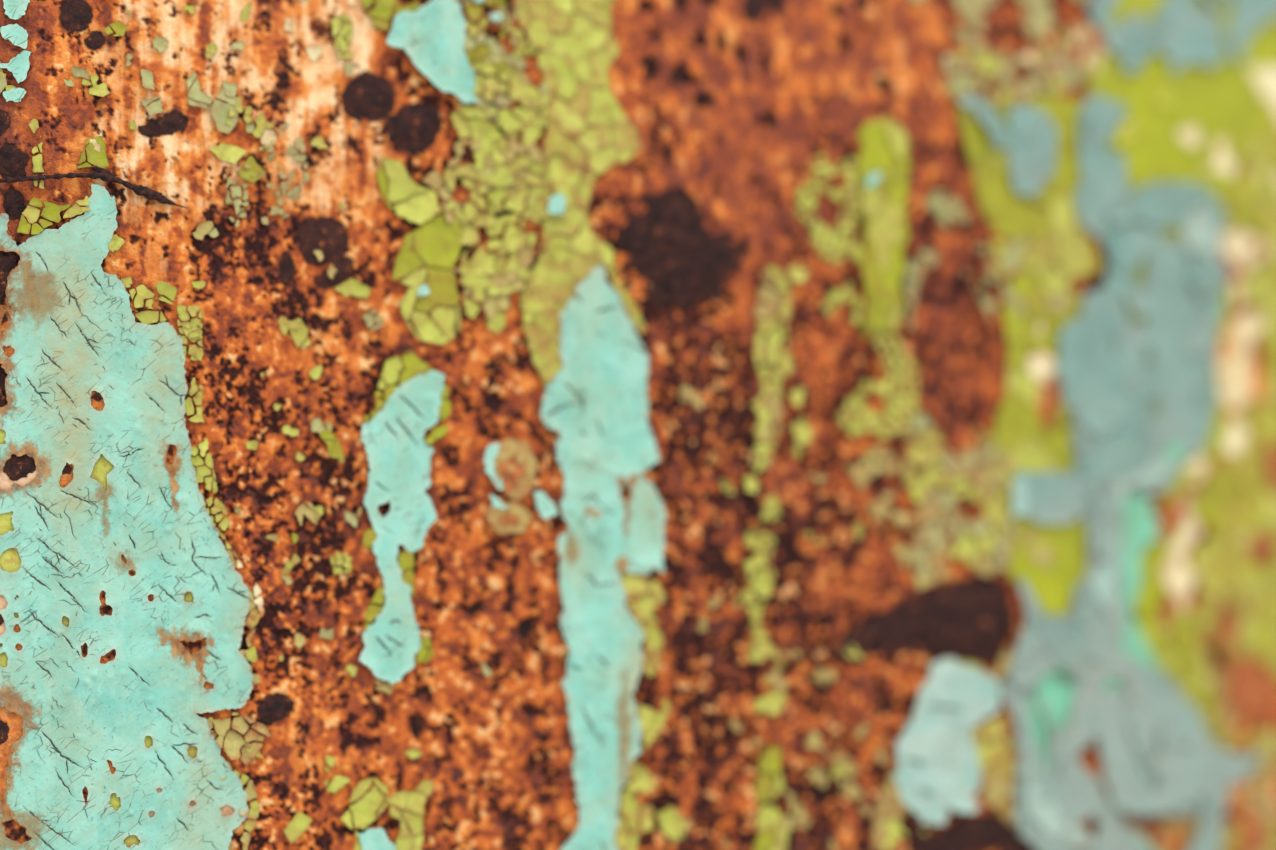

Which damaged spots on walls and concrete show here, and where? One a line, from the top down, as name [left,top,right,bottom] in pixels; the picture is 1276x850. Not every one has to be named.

peeling [186,72,328,227]
corrosion [341,71,443,158]
corrosion [278,216,354,289]
crack [16,252,135,443]
peeling [0,119,271,850]
crack [146,376,190,411]
peeling [306,0,691,850]
corrosion [483,438,558,535]
peeling [794,0,1276,850]
crack [23,448,252,795]
corrosion [830,573,1017,667]
crack [23,806,71,850]